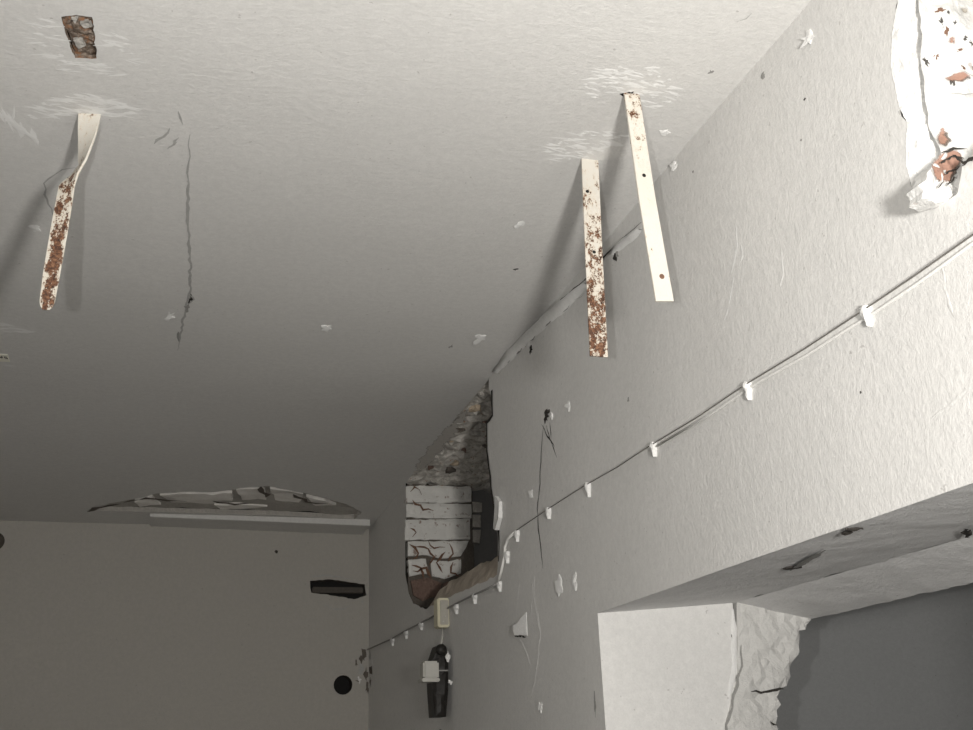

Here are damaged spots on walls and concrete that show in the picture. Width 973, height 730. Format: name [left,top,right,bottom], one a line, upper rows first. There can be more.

corrosion [61,15,97,59]
crack [154,111,195,350]
spalling [88,486,361,519]
spalling [403,380,503,609]